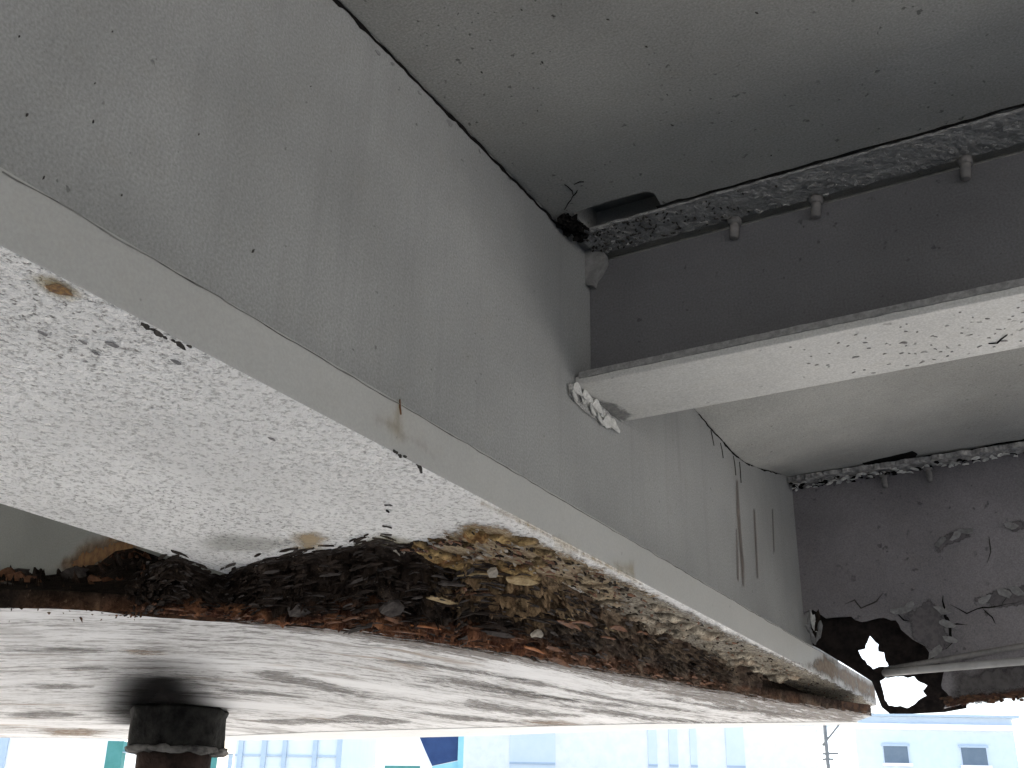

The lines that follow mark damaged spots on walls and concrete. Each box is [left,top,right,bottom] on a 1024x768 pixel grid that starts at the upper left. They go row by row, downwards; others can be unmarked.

crack [333,0,584,231]
spalling [555,185,790,254]
corrosion [43,280,73,296]
peeling [568,382,620,433]
crack [699,414,778,483]
spalling [789,439,1024,491]
corrosion [99,520,876,711]
peeling [805,609,823,645]
peeling [890,601,958,659]
peeling [975,585,1024,608]